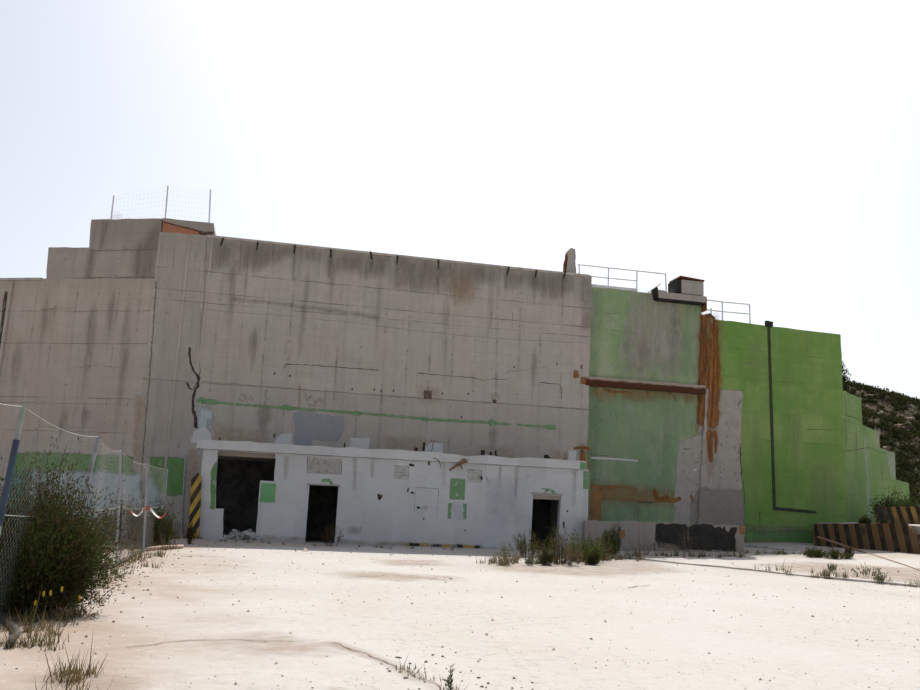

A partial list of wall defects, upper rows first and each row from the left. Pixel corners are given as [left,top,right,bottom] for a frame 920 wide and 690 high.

crack [186,311,589,428]
corrosion [697,297,721,462]
corrosion [591,485,693,521]
peeling [673,388,745,526]